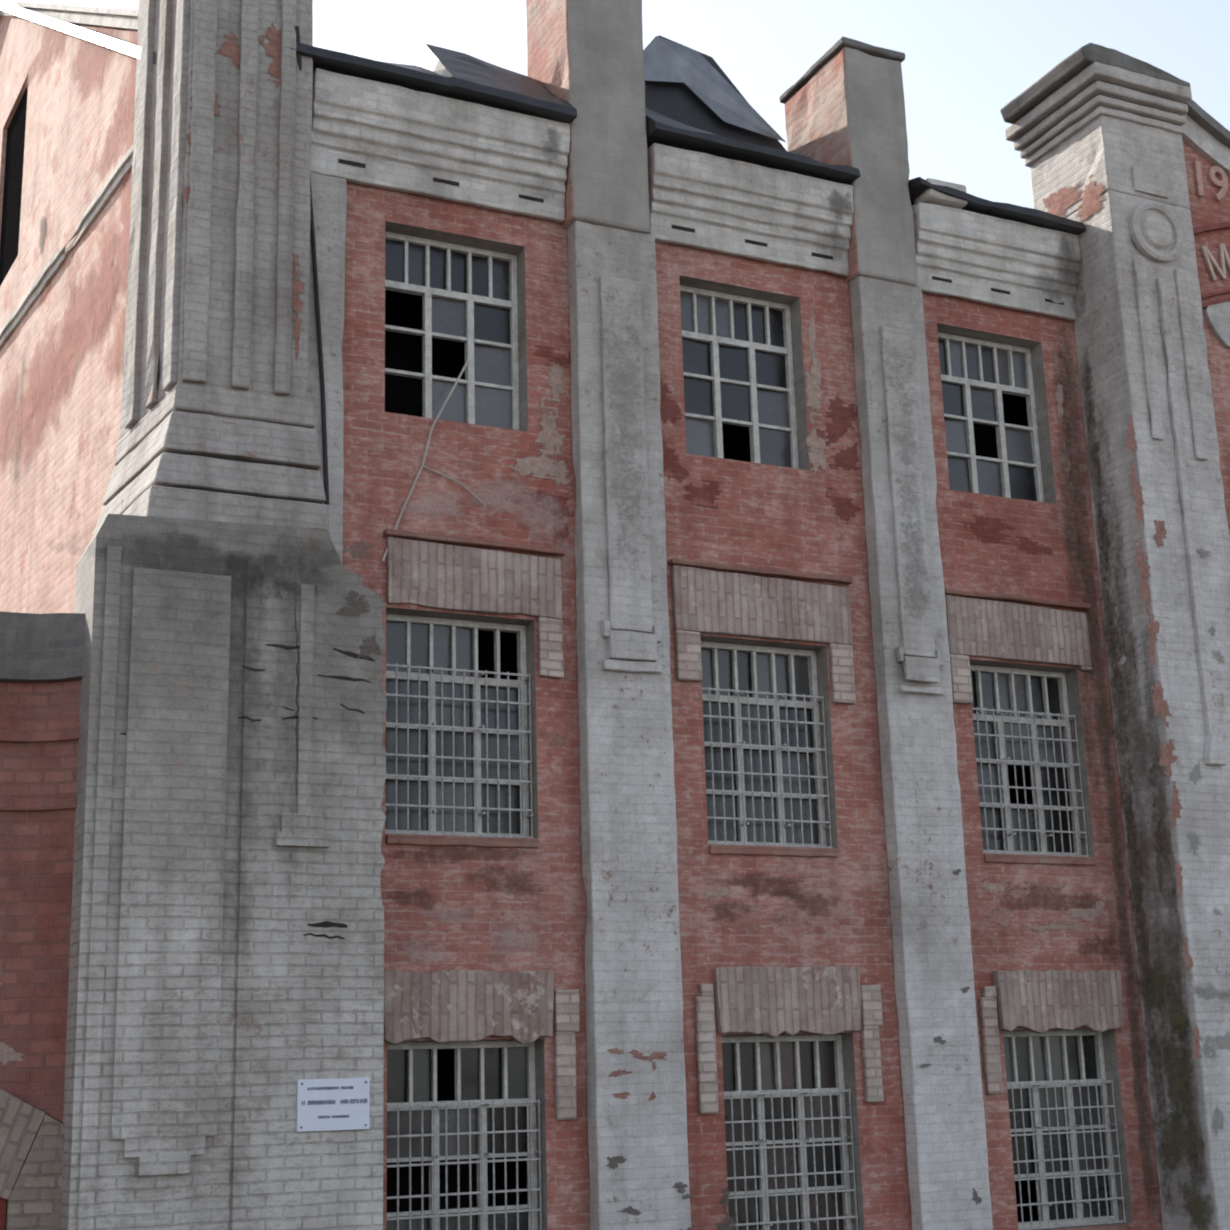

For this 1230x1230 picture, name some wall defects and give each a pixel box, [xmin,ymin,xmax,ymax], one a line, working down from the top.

spalling [509,345,573,552]
spalling [805,303,859,472]
peeling [825,488,863,524]
peeling [1126,415,1167,665]
crack [238,574,375,786]
water stain [1084,363,1168,1158]
peeling [1151,681,1199,852]
crack [304,921,348,939]
peeling [1175,862,1183,897]
water stain [1150,735,1230,1182]
flaking render [0,1042,25,1065]
spalling [608,1048,668,1077]